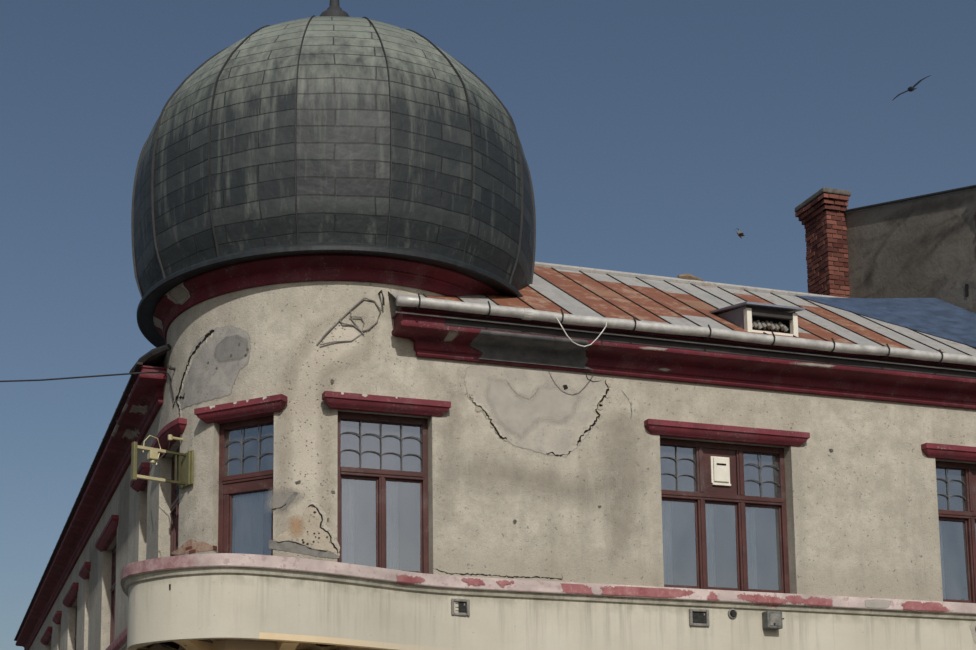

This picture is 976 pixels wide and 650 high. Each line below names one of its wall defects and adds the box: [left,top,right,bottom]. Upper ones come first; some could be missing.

peeling [164,282,190,305]
flaking render [269,502,340,558]
peeling [396,574,425,586]
peeling [461,577,514,588]
peeling [560,583,695,599]
peeling [737,593,833,609]
peeling [865,599,949,614]